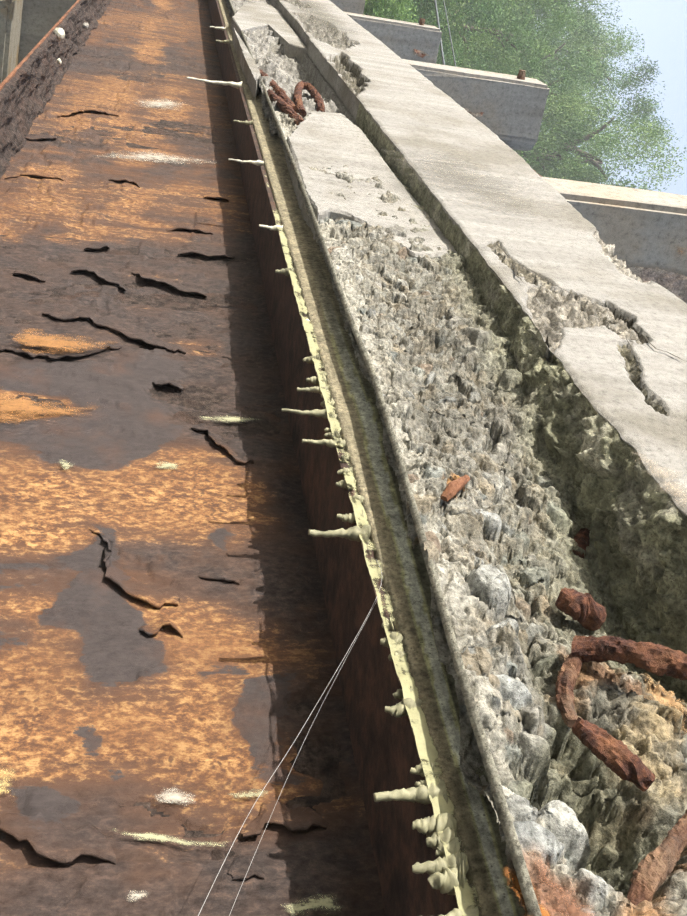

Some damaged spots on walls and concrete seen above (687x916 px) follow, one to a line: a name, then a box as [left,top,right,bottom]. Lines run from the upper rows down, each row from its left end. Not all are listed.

spalling [225,0,273,17]
crack [496,243,593,299]
corrosion [0,309,187,360]
crack [626,332,684,361]
corrosion [0,394,96,423]
spalling [238,0,687,916]
efflorescence [272,201,455,818]
corrosion [89,526,184,638]
corrosion [648,678,687,727]
corrosion [0,812,116,865]
corrosion [241,801,329,838]
efflorescence [454,878,481,916]